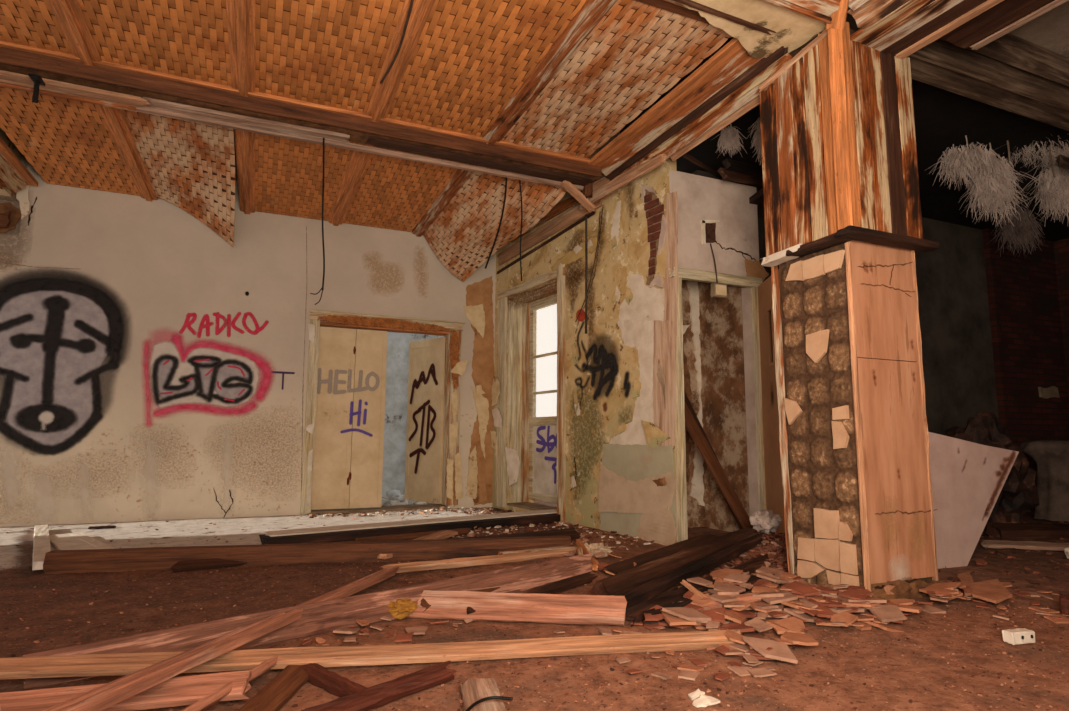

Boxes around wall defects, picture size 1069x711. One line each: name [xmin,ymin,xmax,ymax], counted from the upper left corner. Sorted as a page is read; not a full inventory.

crack [214,489,233,518]
peeling [308,276,520,505]
peeling [609,184,705,506]